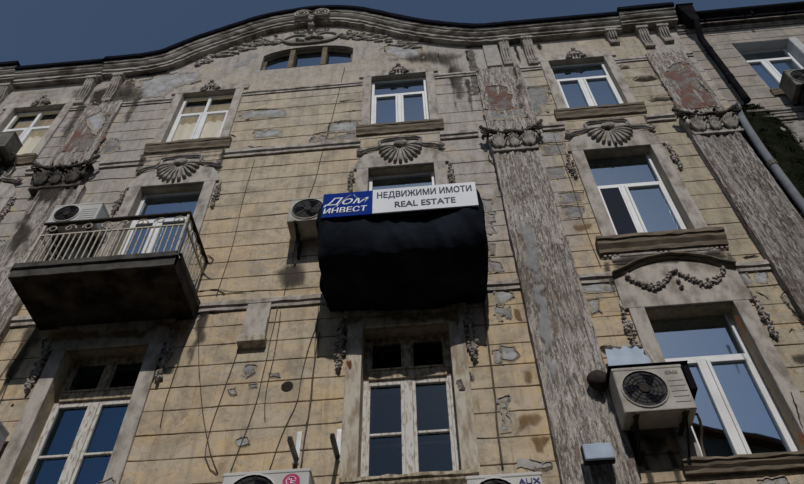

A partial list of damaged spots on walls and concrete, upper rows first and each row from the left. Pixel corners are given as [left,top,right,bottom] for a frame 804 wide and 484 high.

flaking render [59,87,121,154]
flaking render [239,108,287,138]
flaking render [308,120,360,143]
damp [407,53,480,104]
flaking render [468,50,514,113]
flaking render [527,86,552,114]
flaking render [661,60,720,109]
flaking render [482,198,505,273]
flaking render [492,290,515,321]